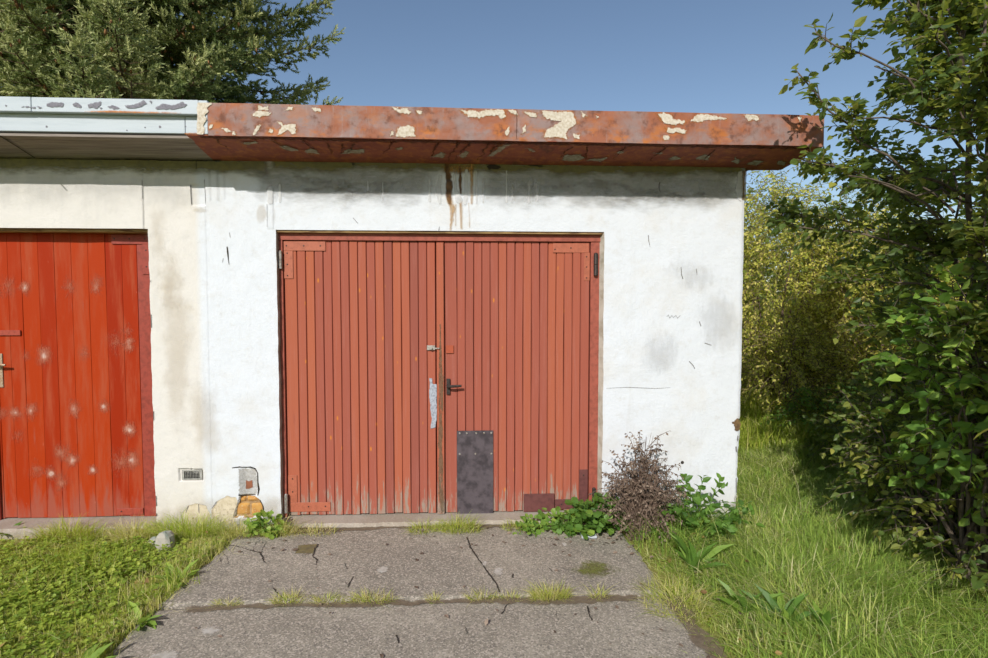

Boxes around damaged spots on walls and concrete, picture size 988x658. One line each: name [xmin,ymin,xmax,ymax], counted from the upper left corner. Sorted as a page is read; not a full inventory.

peeling [23,100,319,154]
peeling [390,107,422,150]
peeling [461,109,599,170]
peeling [658,112,727,140]
damp [0,157,743,204]
corrosion [185,133,809,229]
spalling [181,466,264,525]
crack [467,538,514,614]